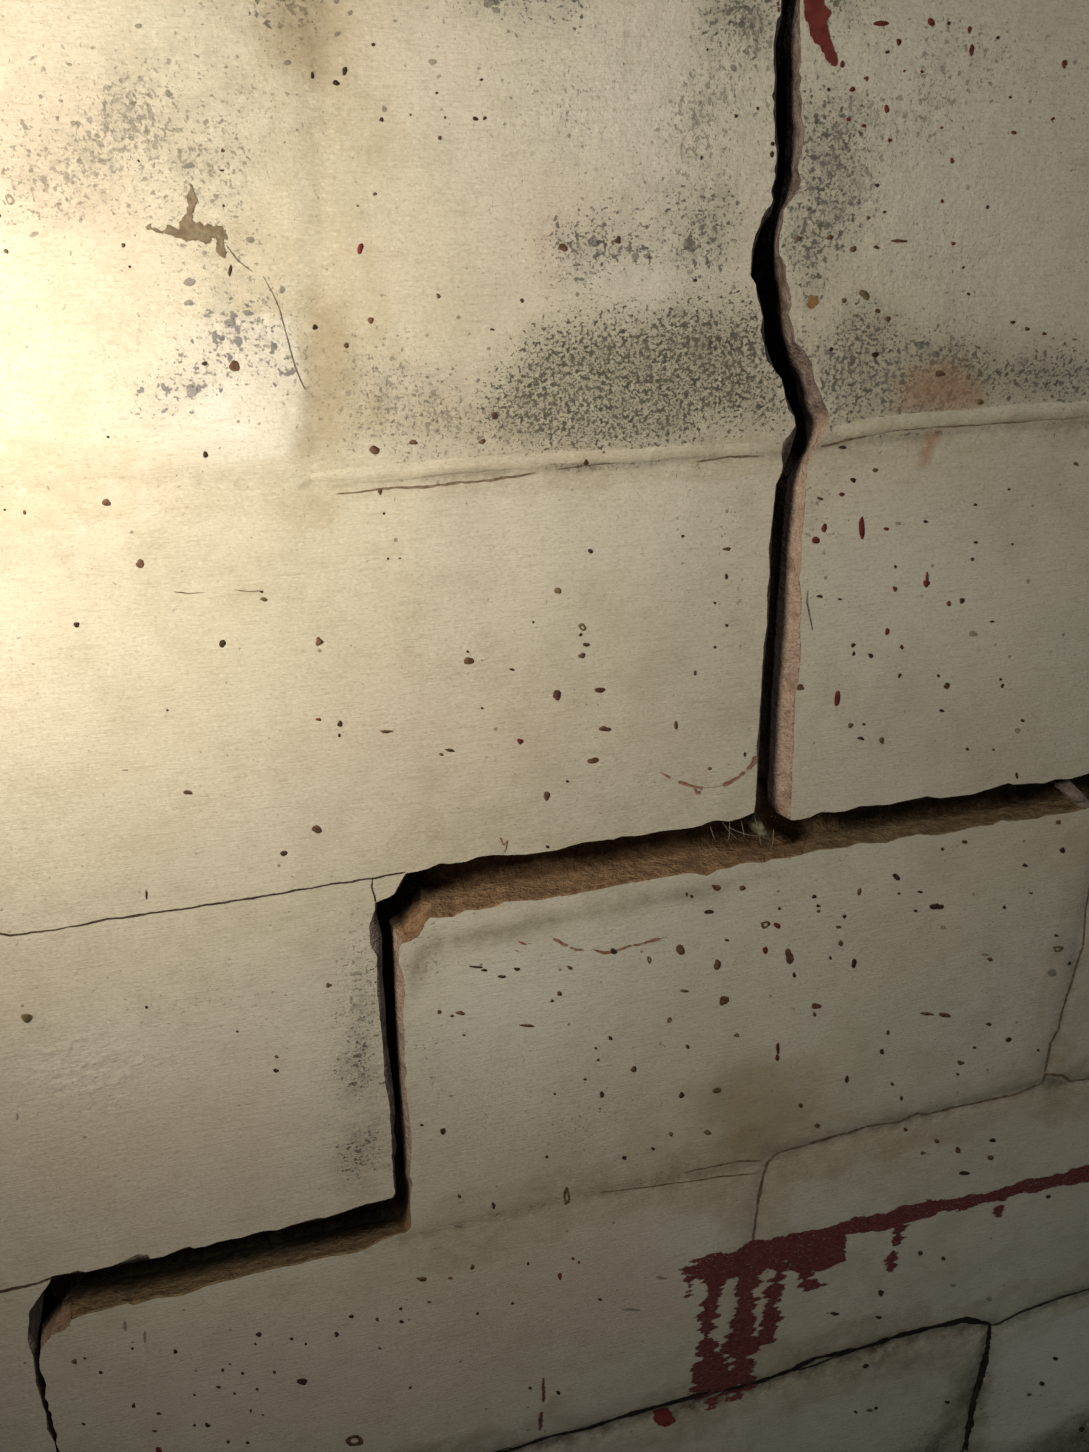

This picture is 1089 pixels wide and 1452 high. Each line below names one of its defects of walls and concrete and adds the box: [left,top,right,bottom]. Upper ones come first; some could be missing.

crack [226,245,305,389]
crack [337,463,611,494]
mould [471,179,795,471]
crack [696,454,758,462]
crack [745,0,1089,862]
mould [780,82,1089,443]
crack [0,817,765,1452]
crack [603,889,1089,1246]
crack [495,1288,1089,1452]